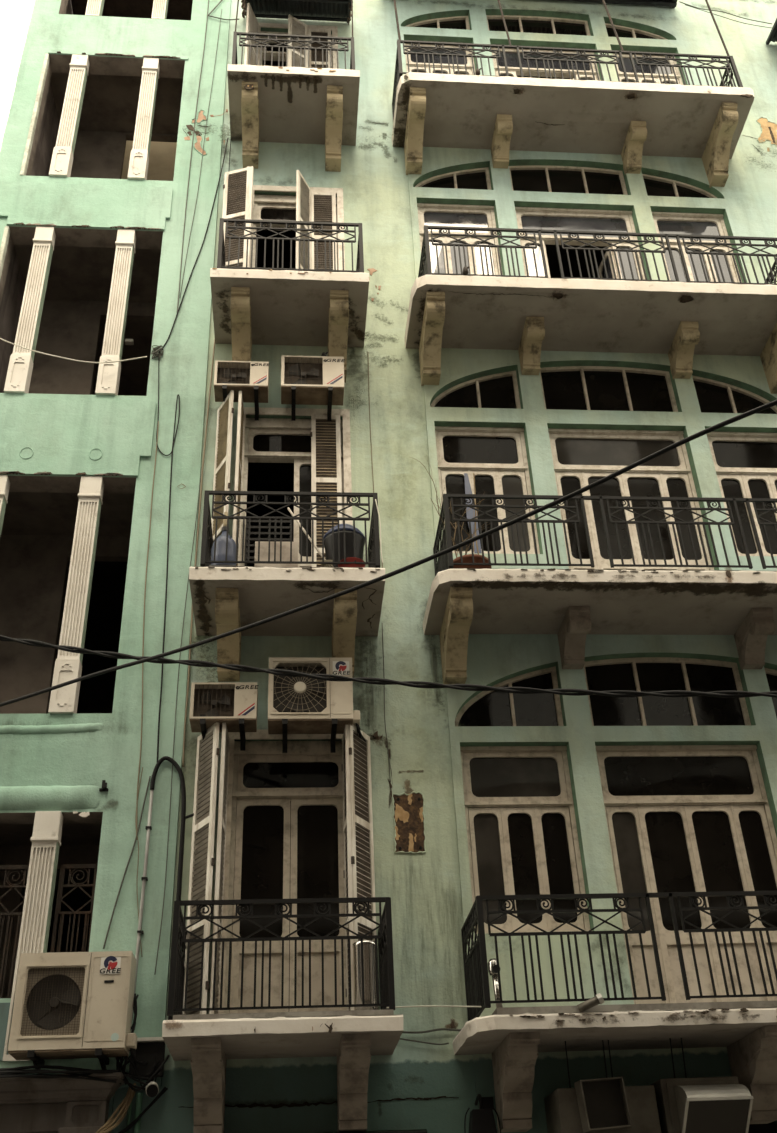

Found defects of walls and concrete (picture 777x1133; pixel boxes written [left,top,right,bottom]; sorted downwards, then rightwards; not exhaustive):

leakage [228,72,322,103]
peeling [184,109,228,156]
peeling [743,117,777,153]
peeling [392,781,426,854]
peeling [521,1013,614,1021]